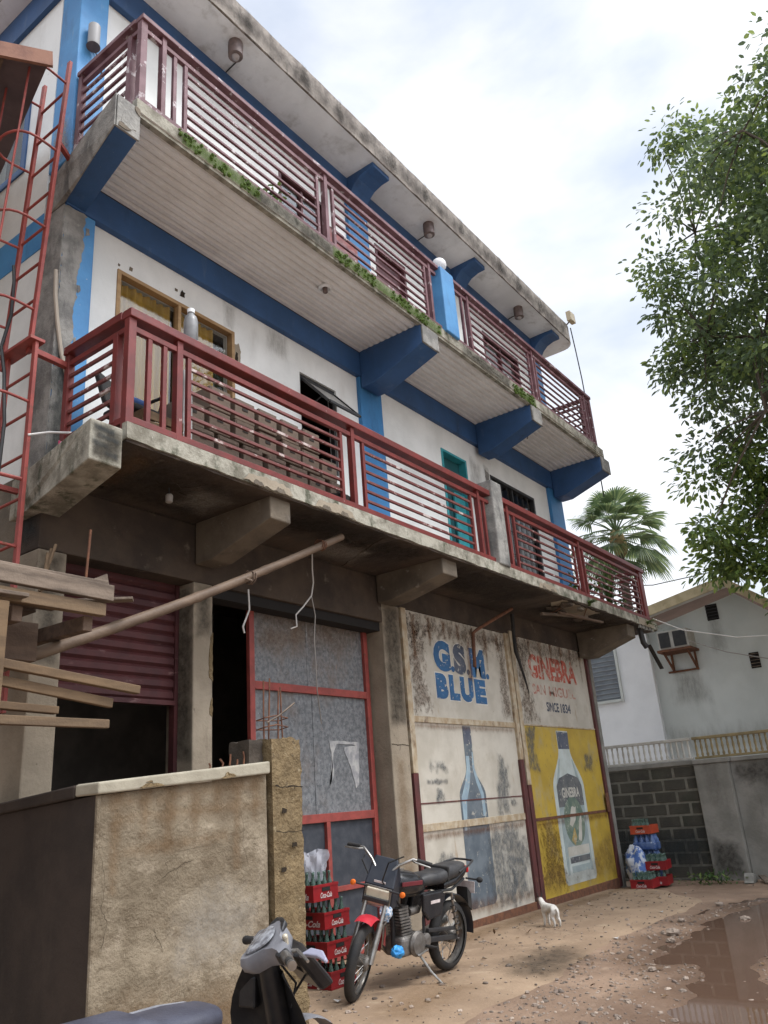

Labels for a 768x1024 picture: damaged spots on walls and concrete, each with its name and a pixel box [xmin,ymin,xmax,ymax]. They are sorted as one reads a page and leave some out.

flaking render [28,203,90,469]
water stain [94,426,119,460]